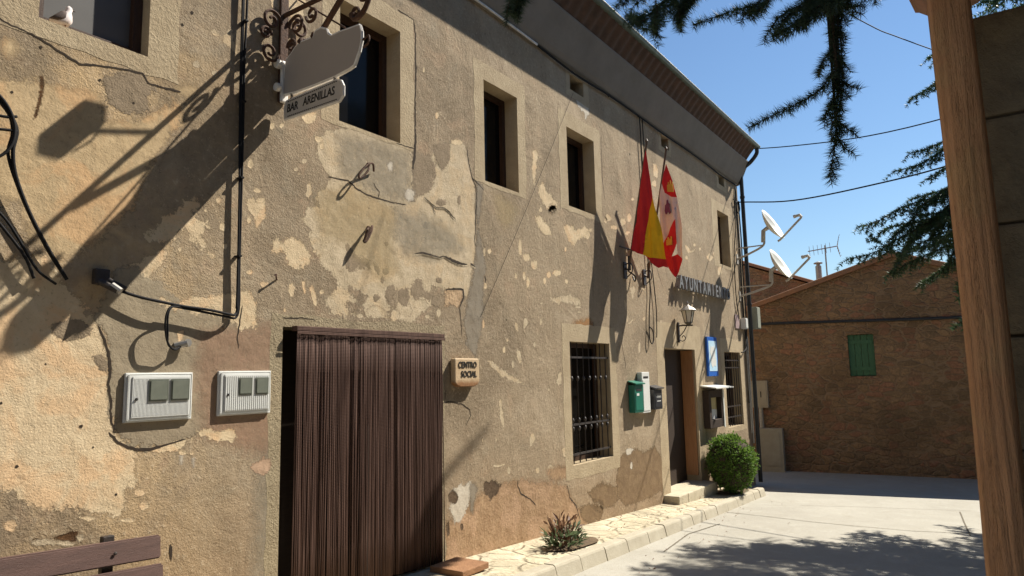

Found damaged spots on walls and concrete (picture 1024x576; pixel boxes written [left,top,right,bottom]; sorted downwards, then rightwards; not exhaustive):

flaking render [2,39,18,56]
crack [0,18,181,92]
flaking render [270,112,491,323]
crack [329,151,486,333]
flaking render [0,76,197,547]
flaking render [159,270,269,332]
flaking render [196,428,238,443]
flaking render [445,446,663,560]